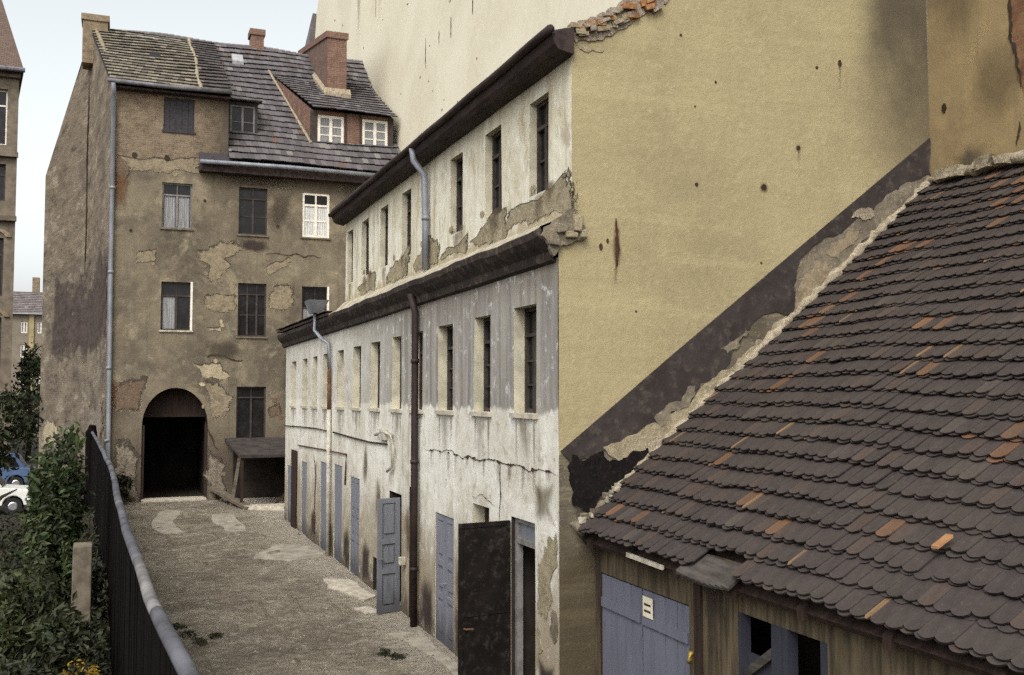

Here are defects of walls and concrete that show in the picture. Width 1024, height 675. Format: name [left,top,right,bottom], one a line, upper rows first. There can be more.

spalling [567,0,668,43]
flaking render [106,154,200,184]
leakage [52,247,107,361]
flaking render [195,240,243,332]
flaking render [266,257,294,310]
peeling [357,167,588,296]
flaking render [771,175,930,330]
flaking render [87,375,148,439]
flaking render [193,359,233,418]
flaking render [603,330,762,461]
crack [425,449,555,509]
peeling [536,534,559,655]